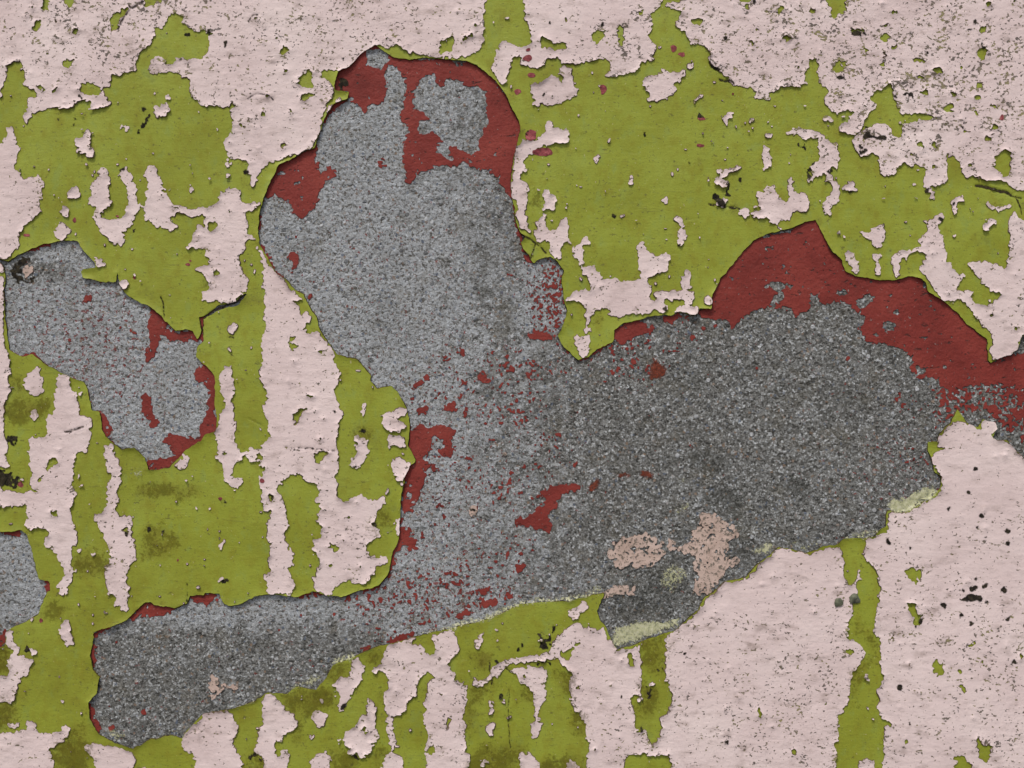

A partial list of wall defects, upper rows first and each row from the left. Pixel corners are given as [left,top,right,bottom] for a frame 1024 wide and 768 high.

peeling [376,44,443,61]
peeling [0,12,297,493]
peeling [285,278,328,342]
peeling [558,299,685,360]
peeling [450,0,1024,334]
peeling [0,376,271,768]
peeling [277,474,323,597]
peeling [254,644,435,768]
peeling [327,350,416,598]
peeling [447,593,611,768]
peeling [622,630,675,744]
peeling [806,538,891,768]